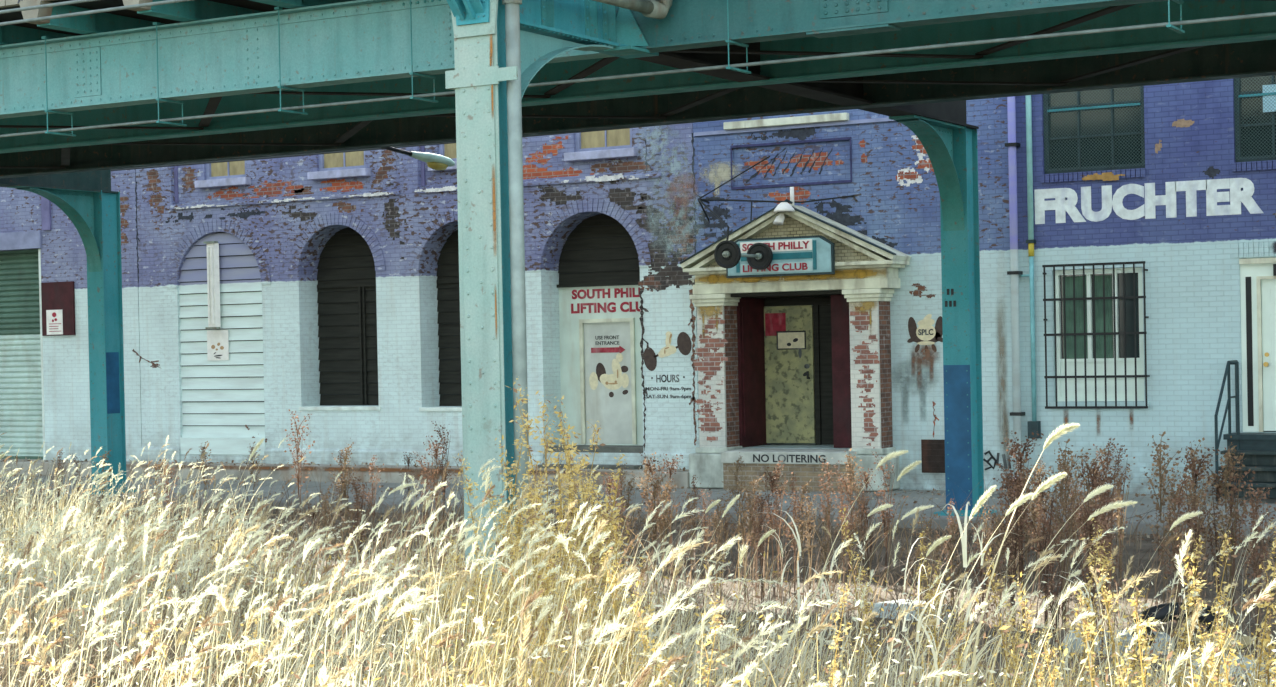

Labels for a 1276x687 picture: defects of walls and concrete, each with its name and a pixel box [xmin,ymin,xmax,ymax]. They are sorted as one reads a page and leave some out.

peeling [146,149,407,259]
spalling [523,135,741,292]
spalling [896,135,934,187]
peeling [693,312,728,442]
peeling [850,306,880,449]
rust [912,346,935,377]